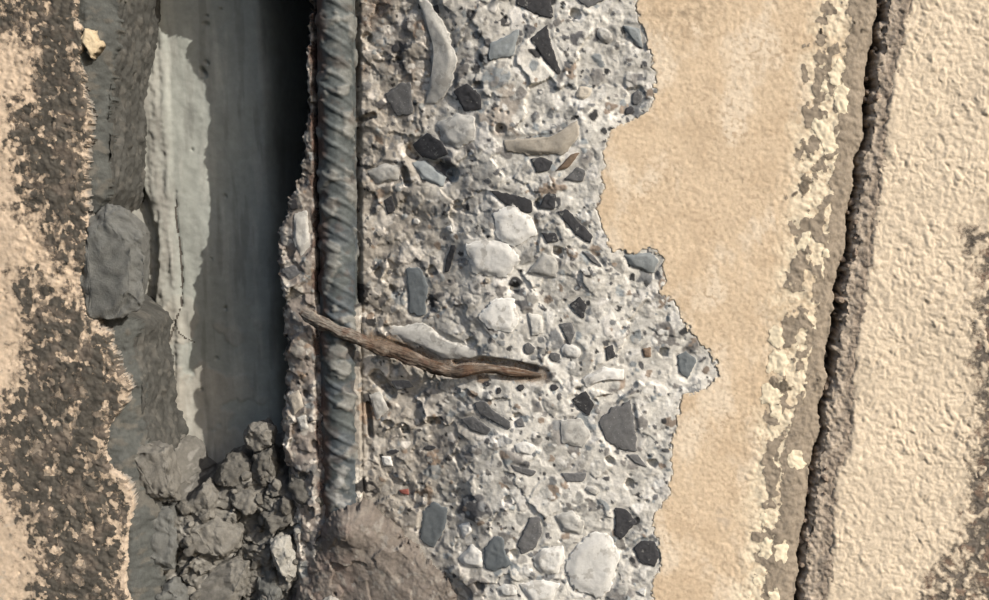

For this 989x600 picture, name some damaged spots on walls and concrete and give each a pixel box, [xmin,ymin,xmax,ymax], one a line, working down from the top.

flaking render [81,28,106,60]
spalling [97,0,719,600]
crack [794,0,915,600]